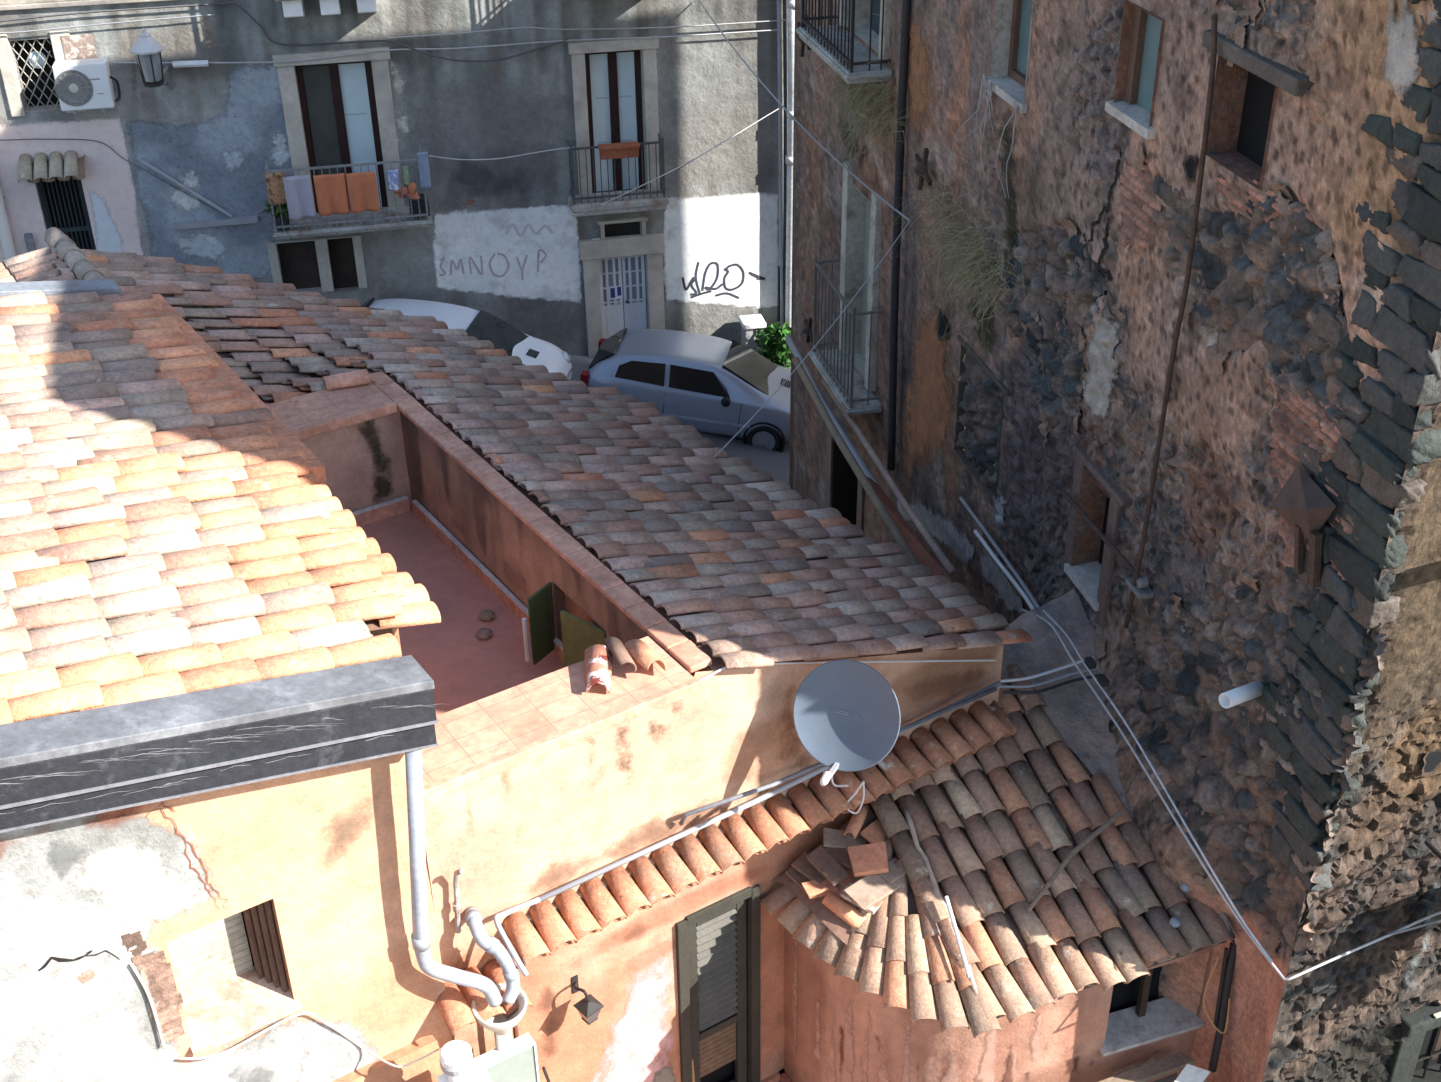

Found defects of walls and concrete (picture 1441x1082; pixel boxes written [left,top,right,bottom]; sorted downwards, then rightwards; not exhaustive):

crack [1085,147,1122,305]
spalling [993,218,1120,442]
spalling [1092,0,1441,961]
crack [146,802,229,909]
crack [38,950,120,971]
flaking render [0,814,378,1082]
flaking render [594,958,678,1082]
water stain [793,940,1042,1082]
water stain [1068,1057,1092,1073]